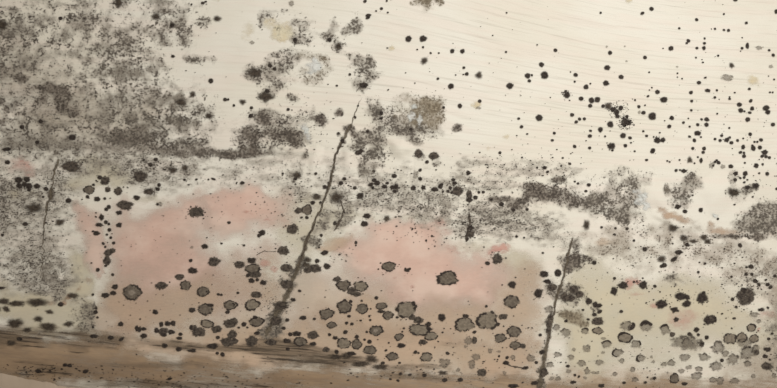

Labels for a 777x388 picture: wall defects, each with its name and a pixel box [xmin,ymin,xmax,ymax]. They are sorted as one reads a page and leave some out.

leakage [406,35,440,72]
leakage [664,77,754,164]
crack [257,101,360,339]
crack [536,238,573,388]
leakage [620,362,688,388]